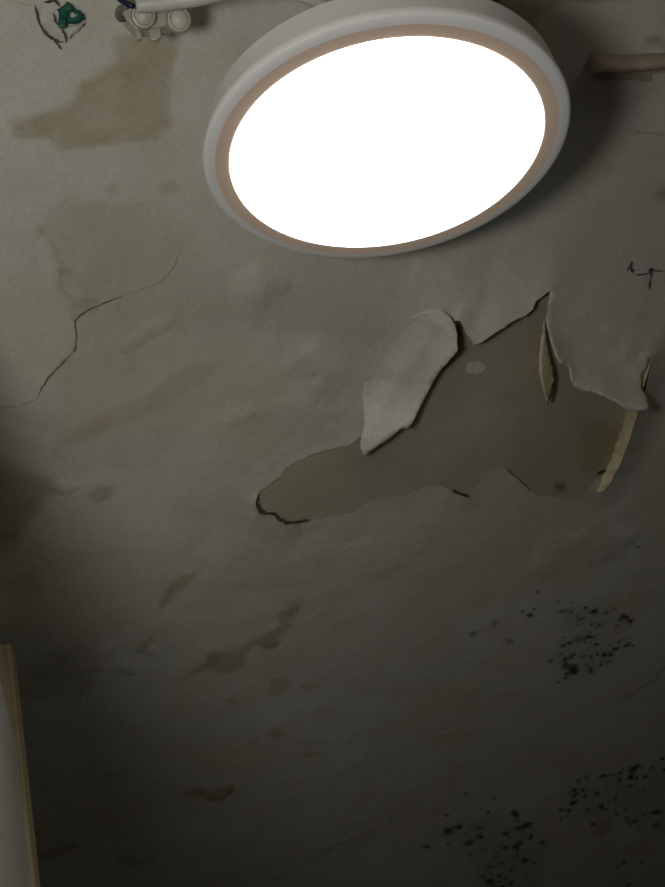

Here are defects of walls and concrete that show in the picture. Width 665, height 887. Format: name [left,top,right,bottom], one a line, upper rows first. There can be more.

peeling [586,53,665,82]
crack [0,253,179,409]
peeling [217,211,665,556]